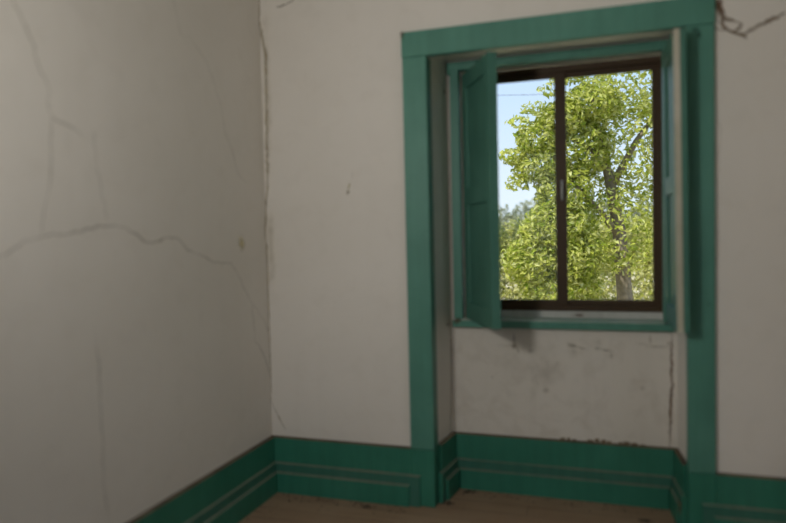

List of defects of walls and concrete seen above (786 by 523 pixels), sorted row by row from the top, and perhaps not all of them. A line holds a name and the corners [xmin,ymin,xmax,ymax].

crack [714,0,786,39]
crack [259,3,283,425]
crack [667,345,675,447]